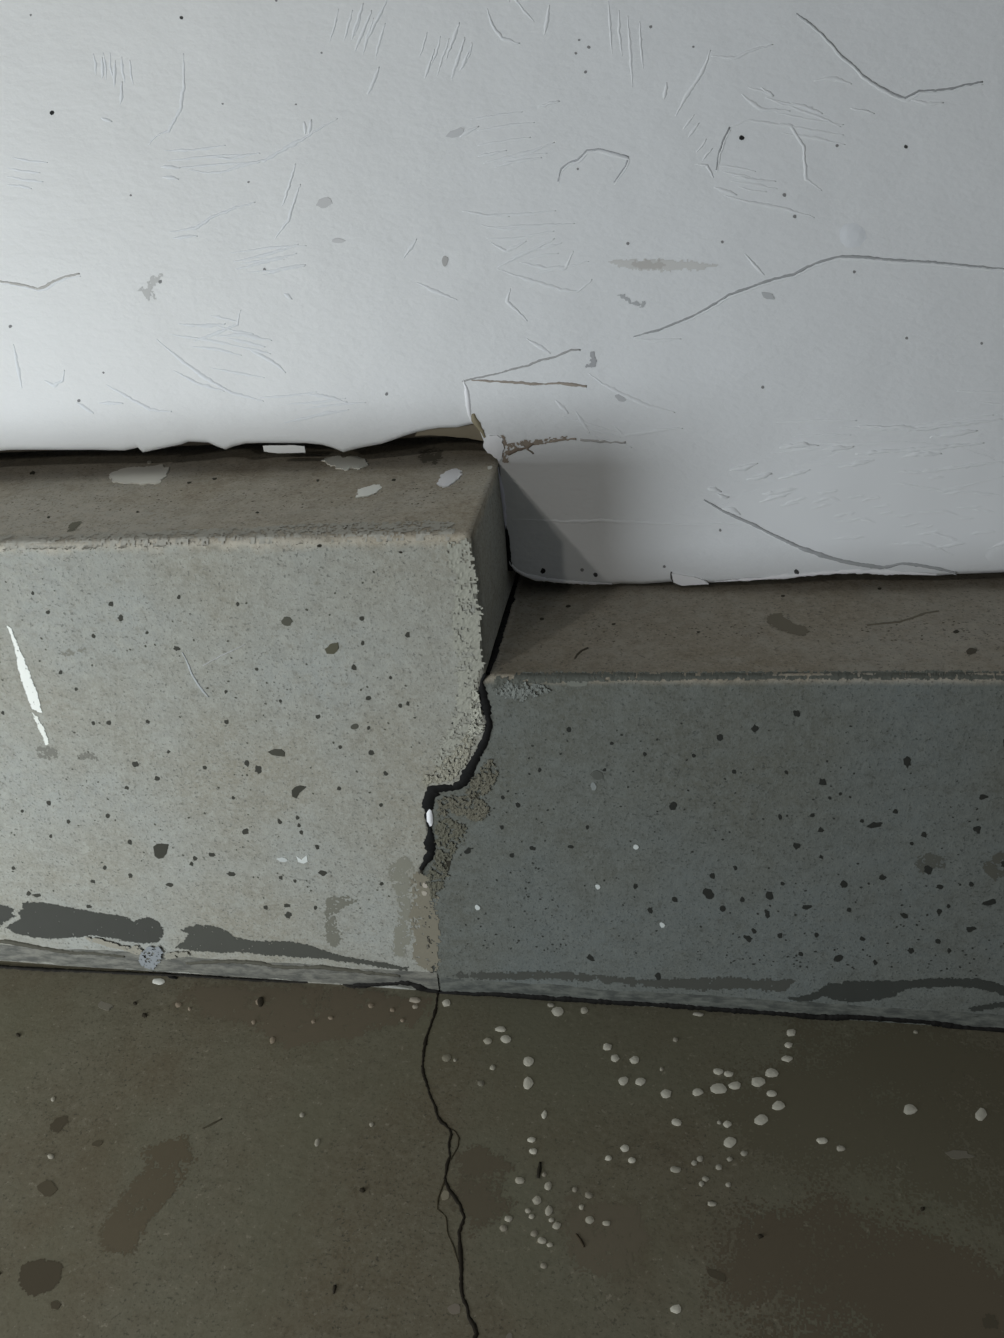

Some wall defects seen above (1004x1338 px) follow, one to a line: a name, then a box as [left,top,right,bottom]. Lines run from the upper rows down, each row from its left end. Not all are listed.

crack [796,13,984,103]
crack [633,255,1004,337]
peeling [415,380,504,461]
crack [419,523,517,874]
leakage [0,901,164,958]
crack [0,965,308,983]
leakage [175,855,415,978]
crack [340,906,1004,1338]
leakage [450,970,1004,1242]